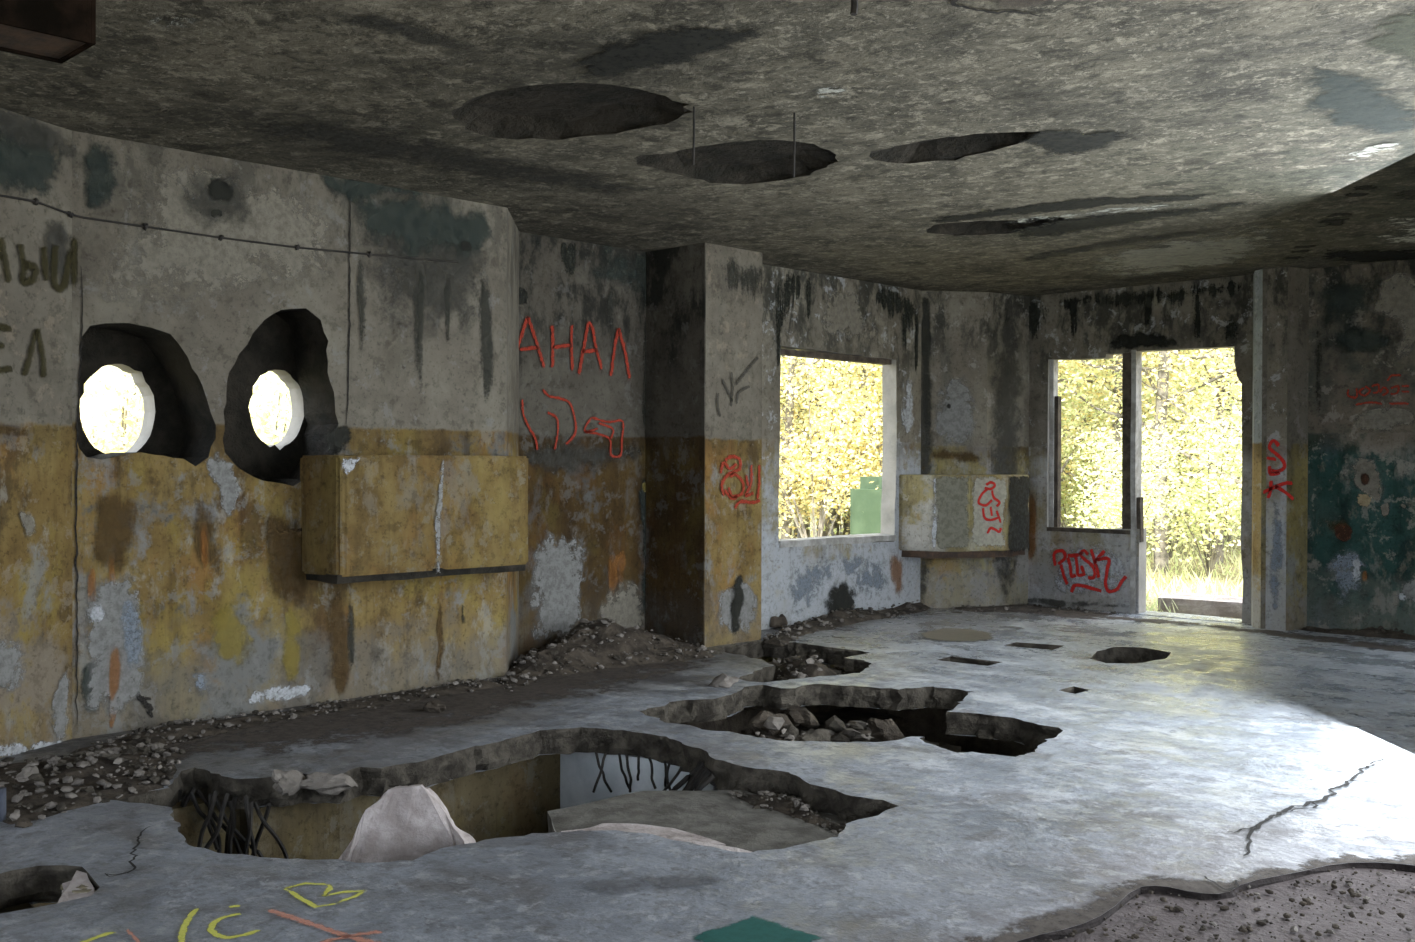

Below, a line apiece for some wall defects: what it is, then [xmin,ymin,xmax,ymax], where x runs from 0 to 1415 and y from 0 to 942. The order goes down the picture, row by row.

crack [951,0,1039,16]
leakage [0,129,62,195]
leakage [84,144,117,209]
leakage [357,197,494,401]
leakage [725,258,812,370]
leakage [992,281,1241,475]
peeling [1352,457,1407,516]
peeling [1328,525,1367,603]
peeling [1398,579,1415,602]
peeling [0,575,145,756]
crack [1204,758,1384,890]